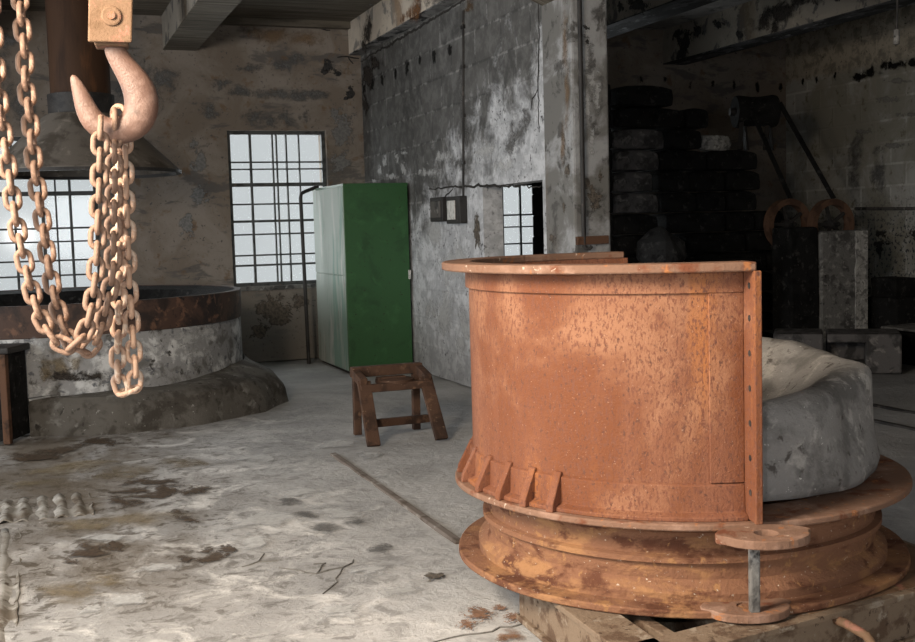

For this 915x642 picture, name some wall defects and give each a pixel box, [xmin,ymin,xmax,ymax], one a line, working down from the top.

leakage [361,55,380,115]
leakage [503,109,530,154]
leakage [10,436,120,462]
leakage [108,472,209,524]
leakage [63,519,134,563]
crack [242,553,354,594]
leakage [81,593,145,613]